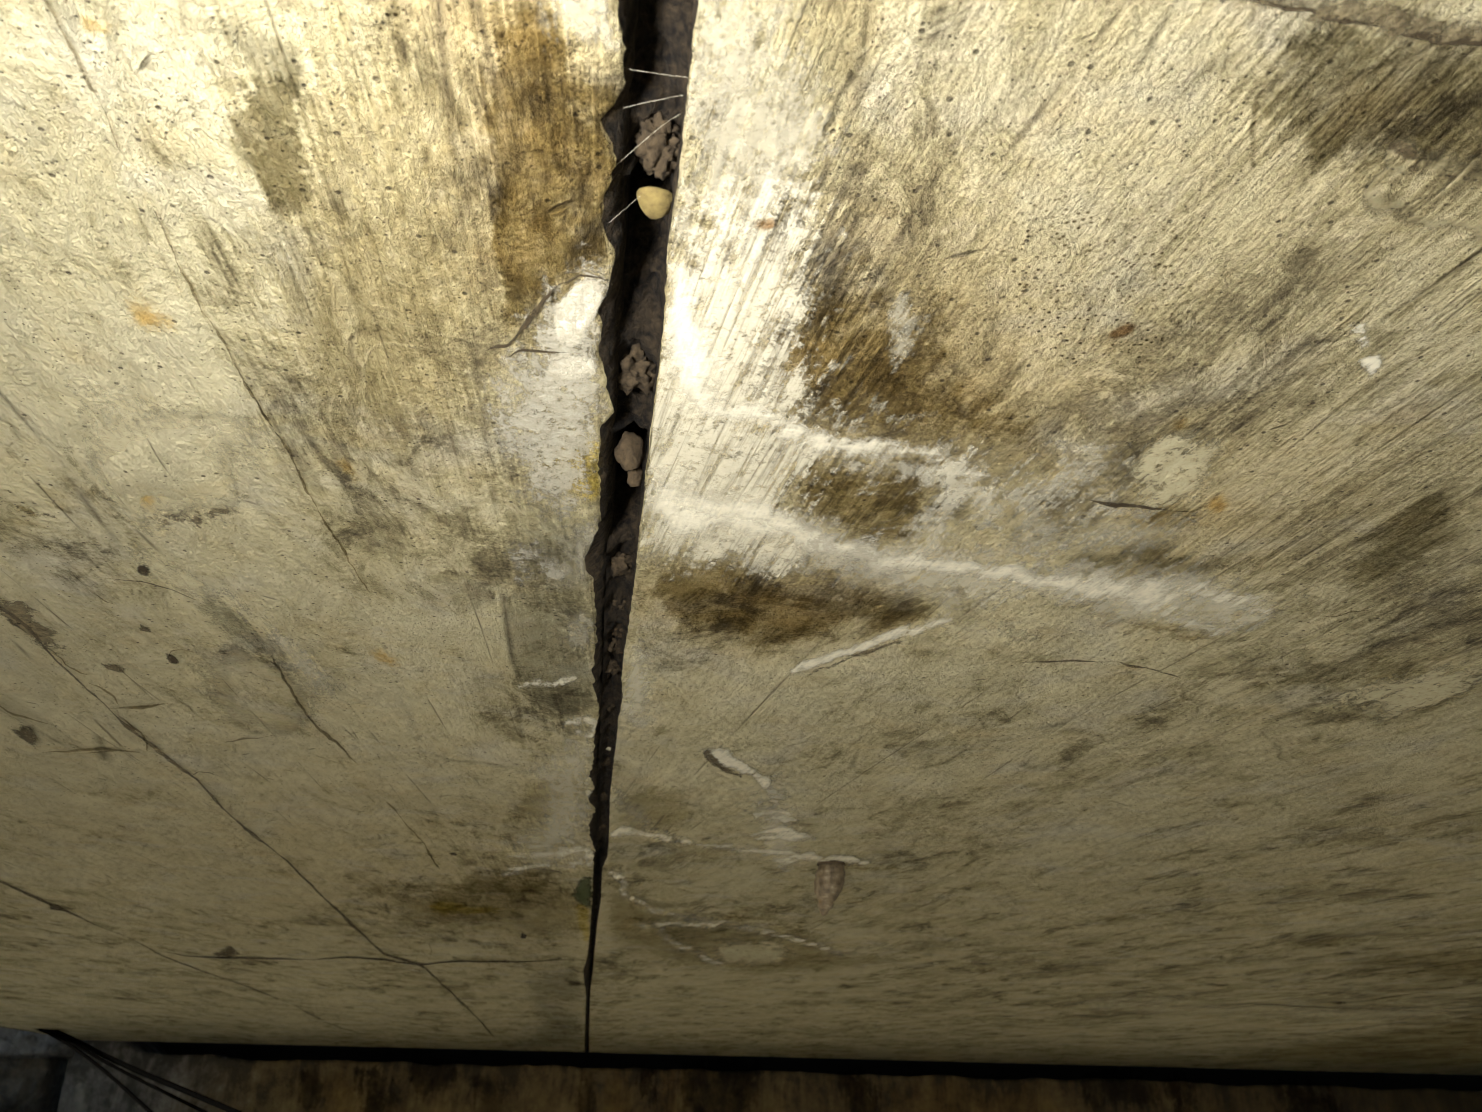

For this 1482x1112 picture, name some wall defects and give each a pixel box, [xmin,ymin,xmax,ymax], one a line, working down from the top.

crack [1253,0,1482,46]
crack [45,0,117,144]
crack [153,208,368,590]
damp [641,147,1269,636]
crack [94,577,193,604]
efflorescence [791,616,1035,673]
damp [566,716,597,737]
crack [0,607,567,1038]
efflorescence [508,846,593,874]
efflorescence [610,748,869,865]
efflorescence [609,870,838,966]